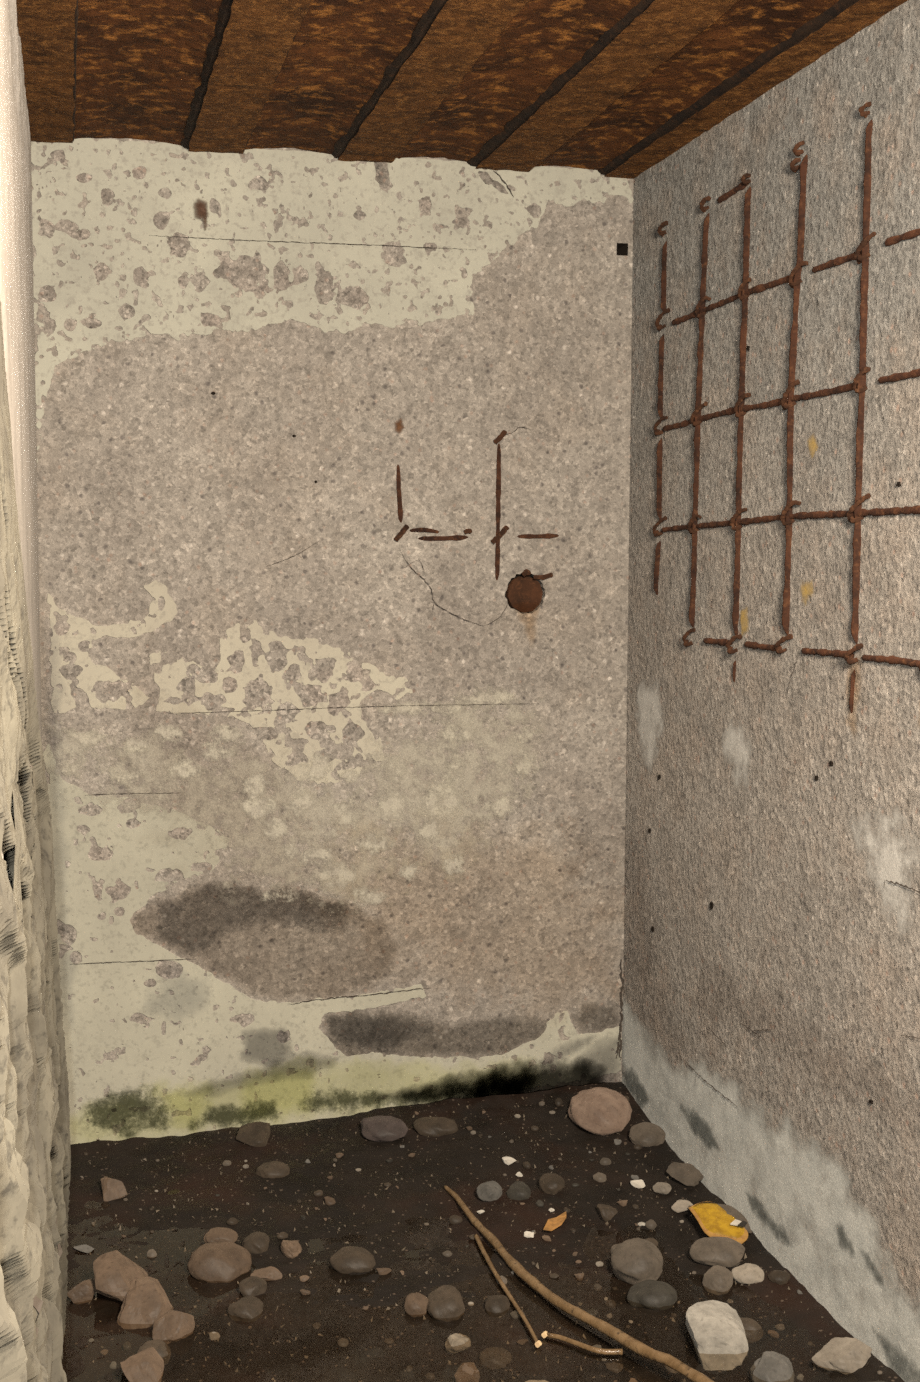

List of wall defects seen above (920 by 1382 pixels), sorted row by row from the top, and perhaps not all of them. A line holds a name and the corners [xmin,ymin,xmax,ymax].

peeling [31,138,634,462]
rust [394,465,472,542]
rust [491,430,559,580]
peeling [43,580,622,1145]
damp [92,1092,165,1136]
damp [191,1104,275,1126]
damp [310,1061,603,1107]
damp [622,1002,920,1382]